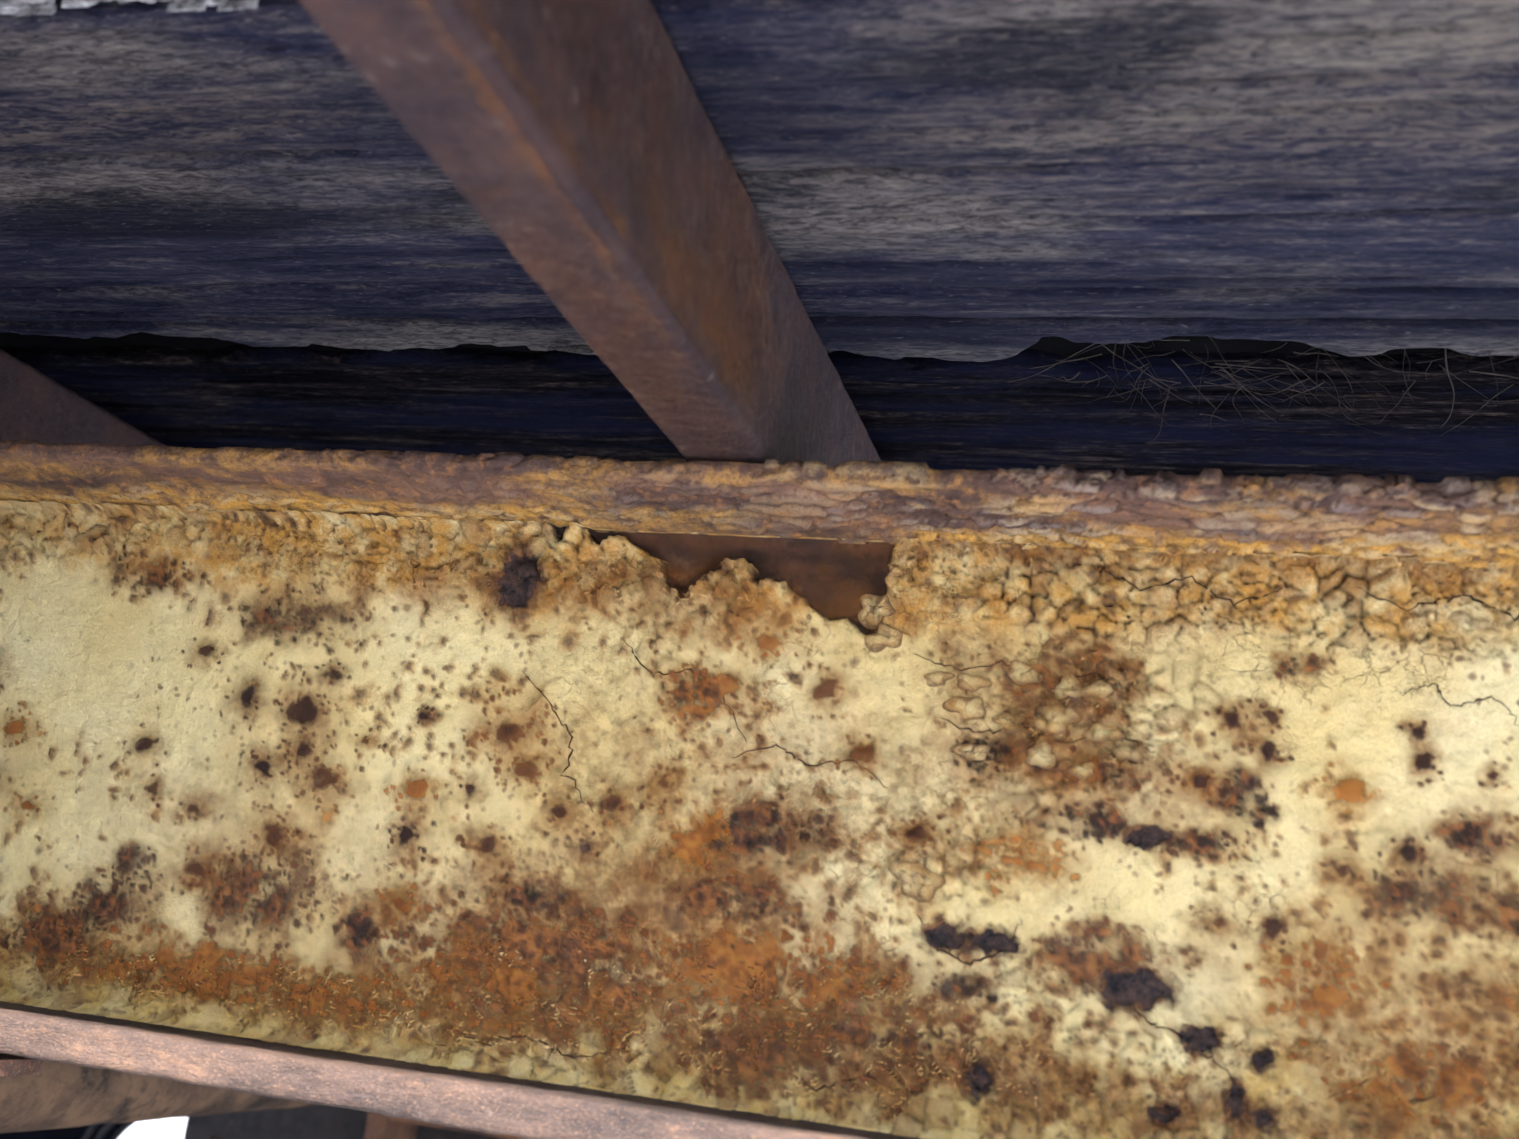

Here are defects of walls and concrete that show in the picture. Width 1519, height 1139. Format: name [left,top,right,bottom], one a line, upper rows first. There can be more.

peeling [548,522,566,541]
corrosion [111,545,190,595]
spalling [486,547,547,617]
peeling [584,527,895,636]
corrosion [1004,542,1102,573]
crack [1094,568,1282,609]
crack [1356,587,1519,621]
crack [915,654,1009,671]
crack [1401,683,1519,726]
crack [941,718,1086,744]
corrosion [0,554,1519,1139]